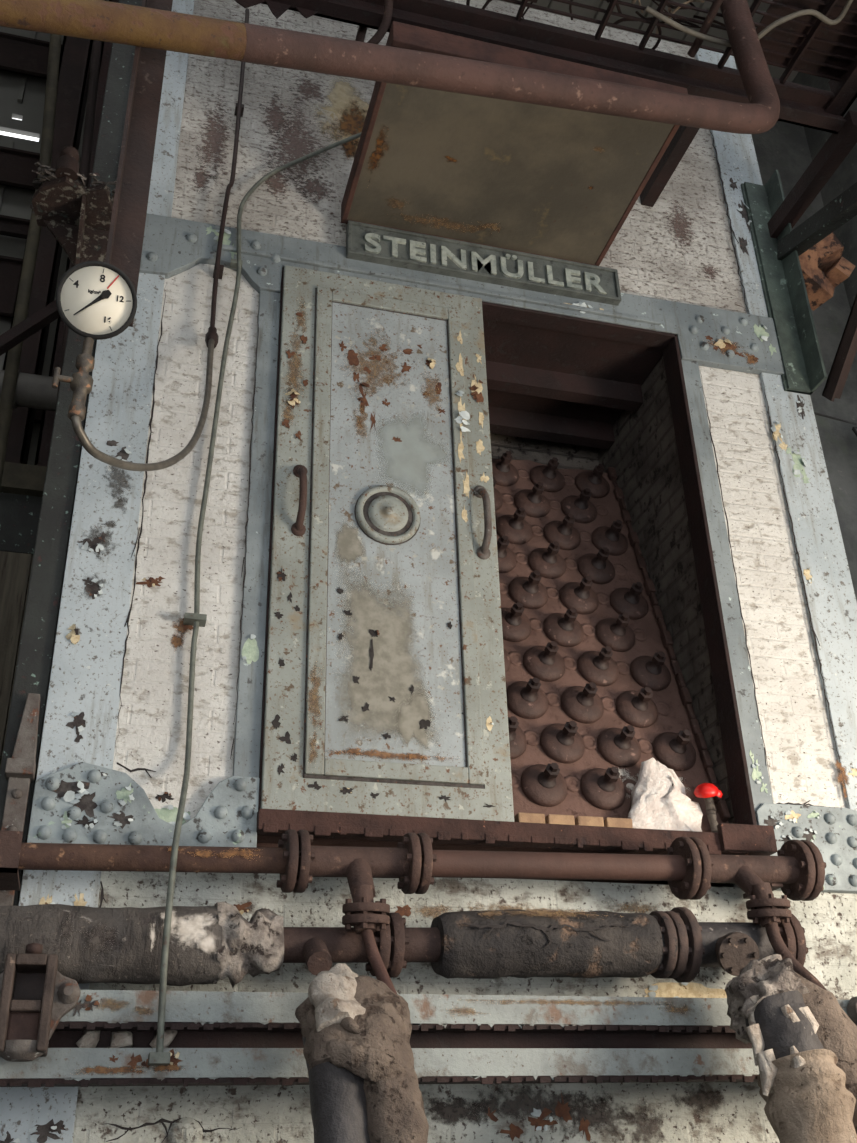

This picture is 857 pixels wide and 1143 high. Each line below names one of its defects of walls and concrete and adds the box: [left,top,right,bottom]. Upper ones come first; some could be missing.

rust [327,101,367,157]
rust [282,306,308,440]
rust [339,338,446,435]
peeling [381,331,489,522]
rust [705,335,758,364]
peeling [337,524,363,564]
peeling [341,585,432,748]
crack [106,1118,172,1142]